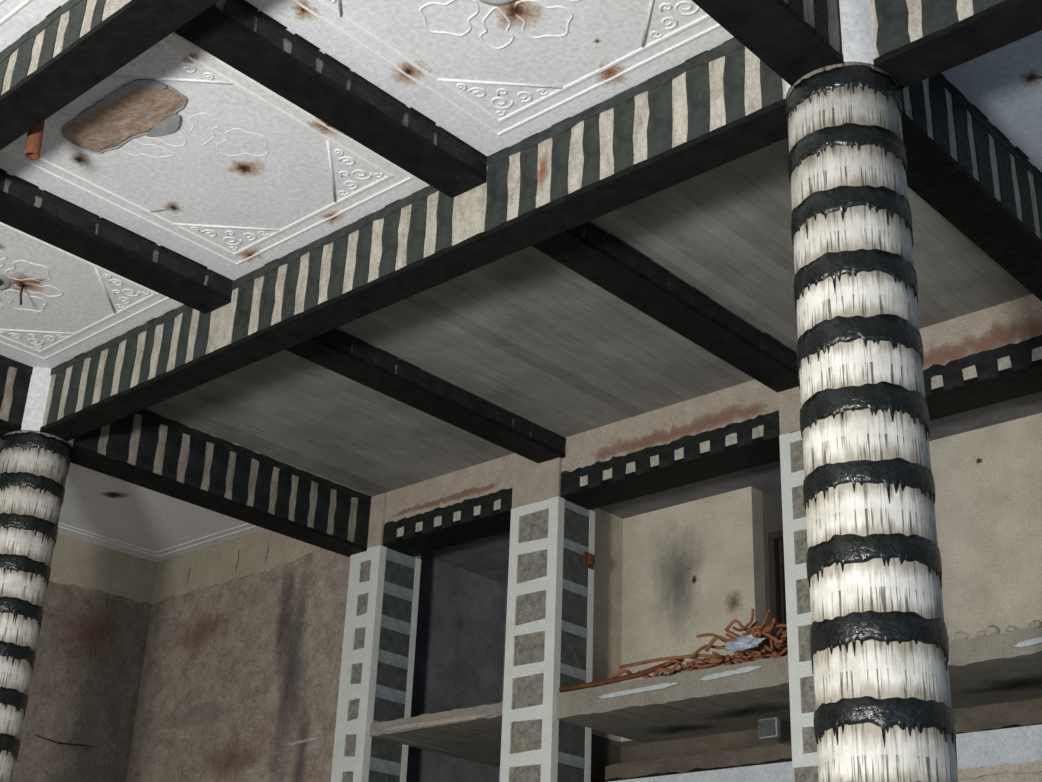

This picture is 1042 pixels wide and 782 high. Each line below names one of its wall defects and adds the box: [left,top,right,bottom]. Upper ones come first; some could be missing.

corrosion [497,0,540,26]
spalling [61,79,187,154]
corrosion [234,163,256,174]
corrosion [11,274,47,290]